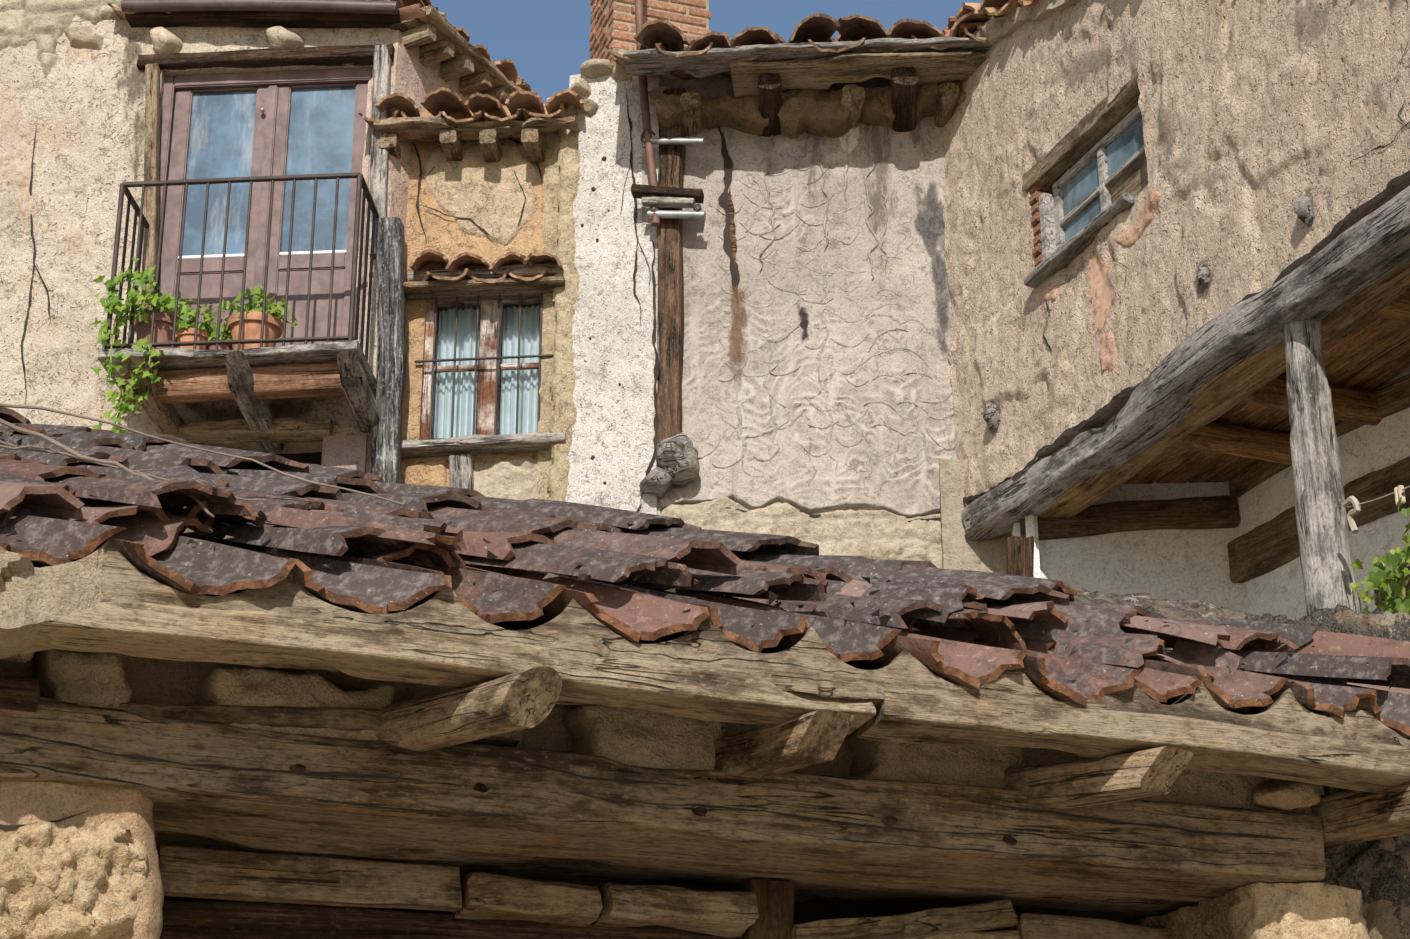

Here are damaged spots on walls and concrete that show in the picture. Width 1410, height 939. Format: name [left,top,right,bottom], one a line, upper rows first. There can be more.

crack [21,117,51,394]
crack [413,141,526,240]
crack [718,126,740,300]
leakage [914,182,949,351]
spalling [1085,252,1117,372]
spalling [1114,188,1162,247]
crack [0,809,92,830]